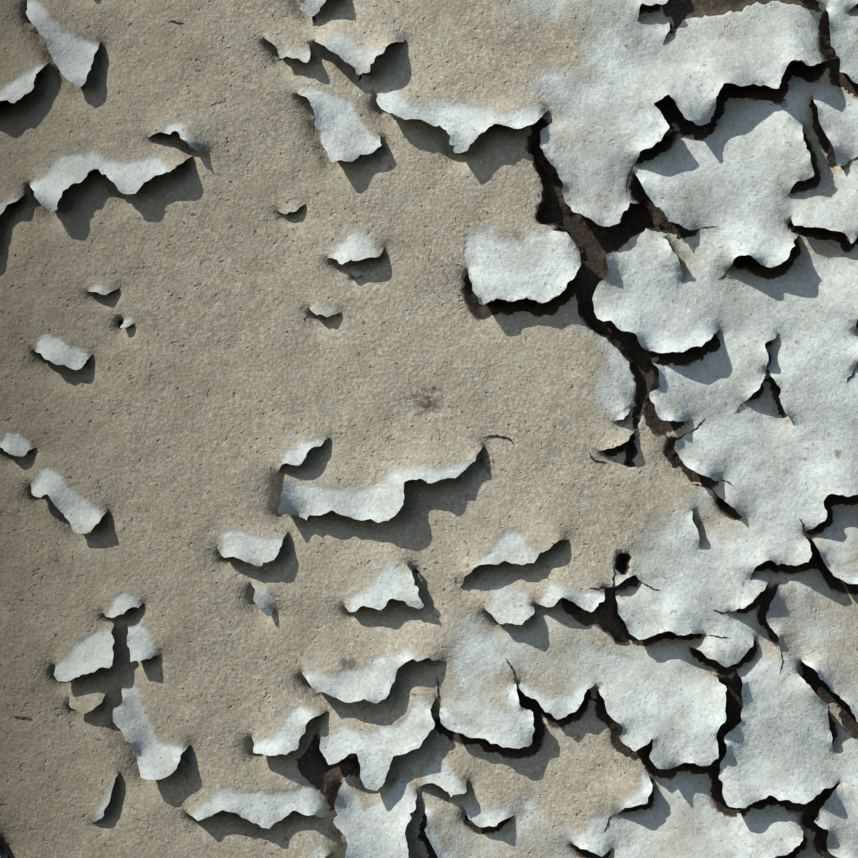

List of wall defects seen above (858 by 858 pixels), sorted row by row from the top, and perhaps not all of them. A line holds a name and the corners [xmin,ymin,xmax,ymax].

peeling [0,0,101,103]
peeling [0,114,205,214]
peeling [0,428,37,456]
peeling [185,0,858,858]
peeling [30,460,108,534]
peeling [54,586,160,714]
peeling [113,678,190,780]
peeling [91,770,119,823]